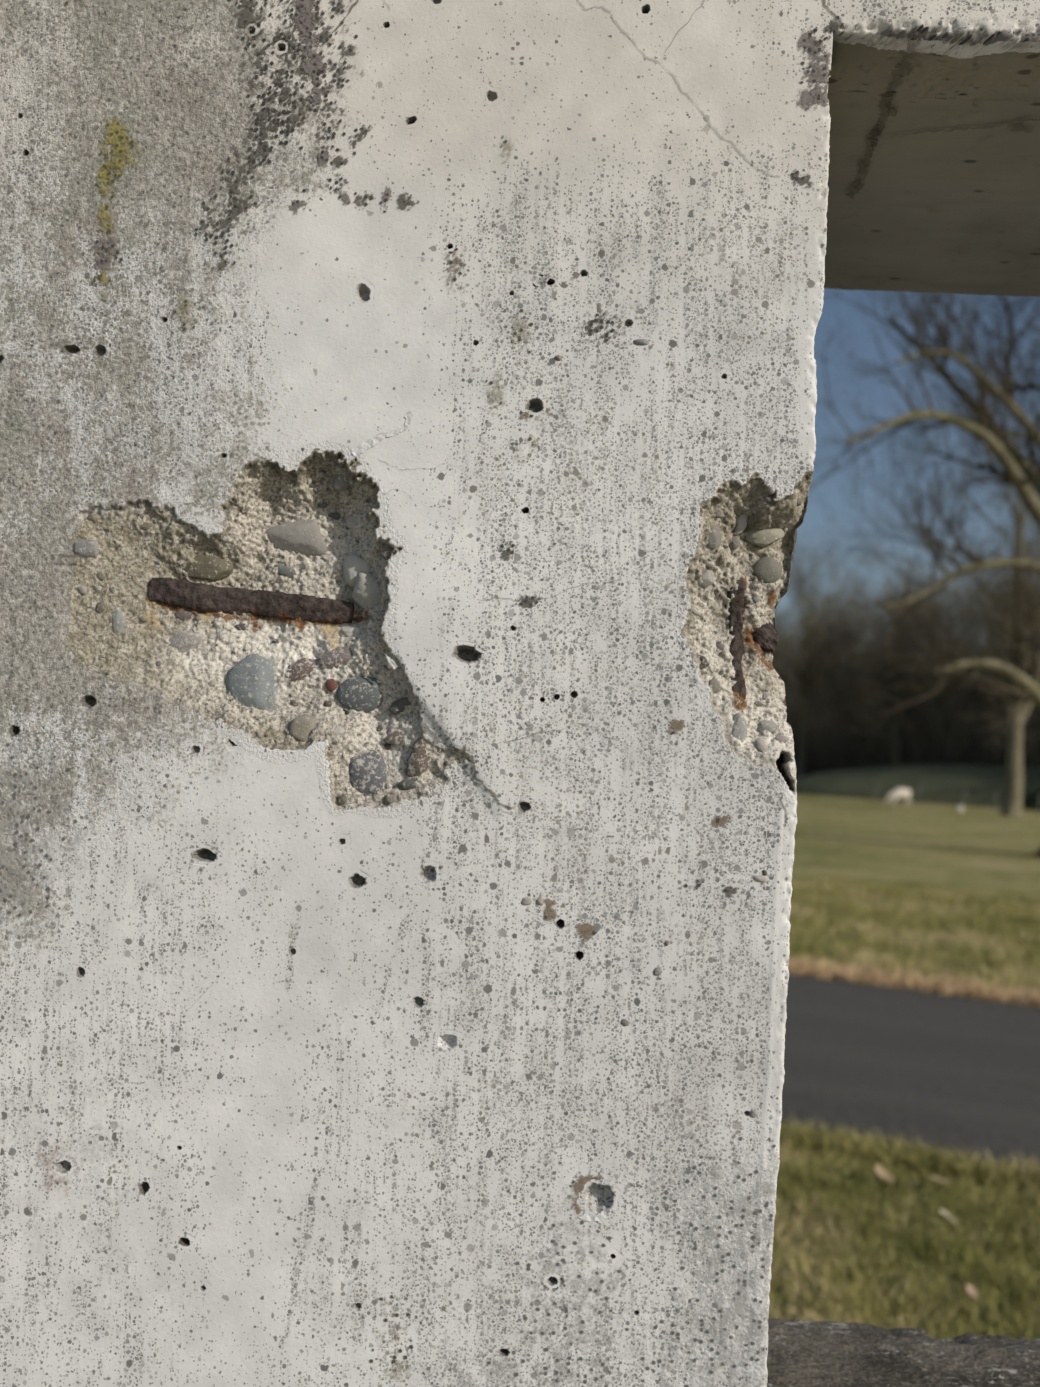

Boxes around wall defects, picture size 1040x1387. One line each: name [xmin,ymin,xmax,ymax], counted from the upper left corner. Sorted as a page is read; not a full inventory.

crack [328,0,359,38]
leakage [0,0,419,982]
rust [145,583,371,649]
spalling [50,410,484,818]
spalling [675,462,814,805]
rust [741,575,774,670]
rust [733,691,747,712]